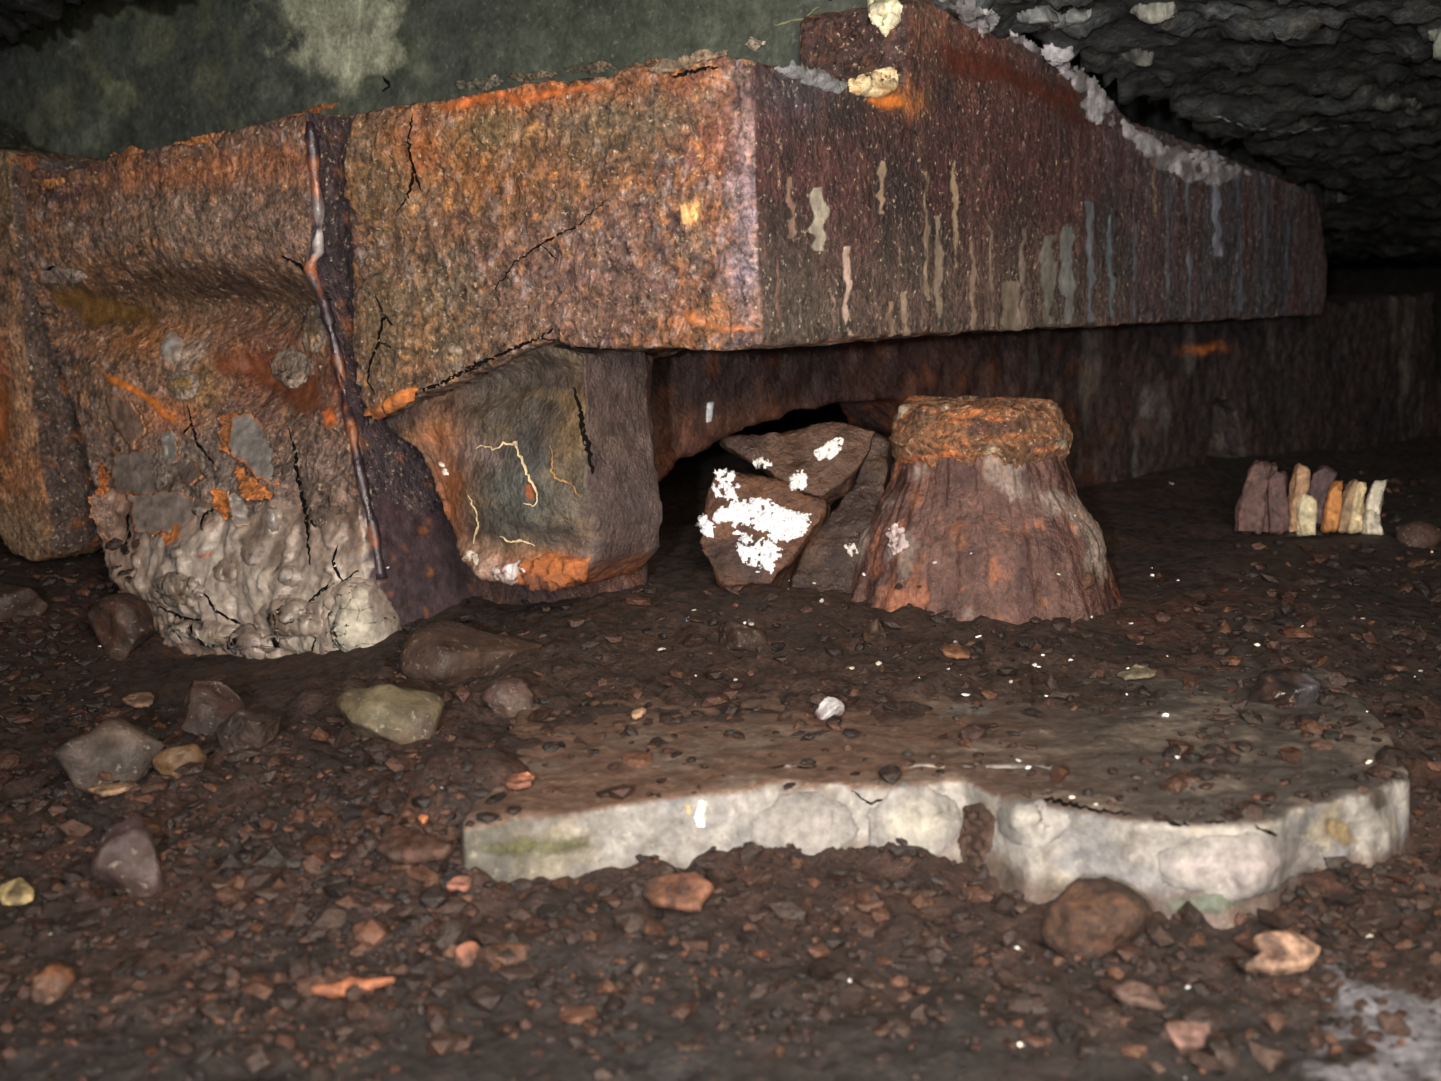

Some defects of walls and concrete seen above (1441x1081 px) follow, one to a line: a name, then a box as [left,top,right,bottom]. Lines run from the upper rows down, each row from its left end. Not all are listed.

corrosion [445,85,601,109]
corrosion [870,95,903,108]
crack [396,114,423,212]
corrosion [680,204,689,224]
corrosion [214,352,336,425]
crack [367,295,393,395]
corrosion [363,386,418,421]
crack [415,329,565,396]
crack [573,387,595,474]
crack [288,428,359,602]
corrosion [517,552,591,592]
crack [158,593,241,624]